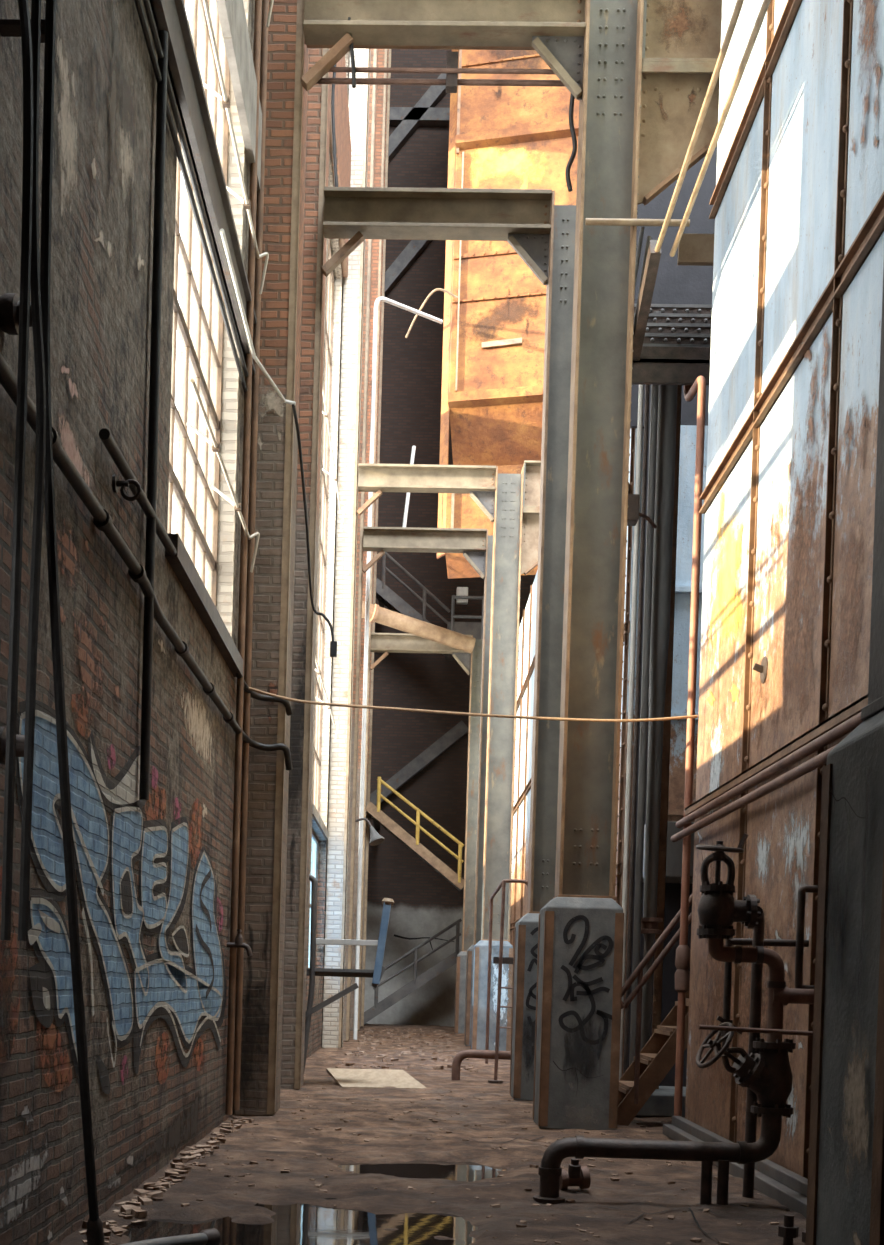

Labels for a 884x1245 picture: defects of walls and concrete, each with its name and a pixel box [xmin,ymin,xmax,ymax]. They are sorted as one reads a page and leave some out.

corrosion [852,0,881,154]
corrosion [843,398,870,470]
corrosion [709,491,742,643]
corrosion [730,331,829,742]